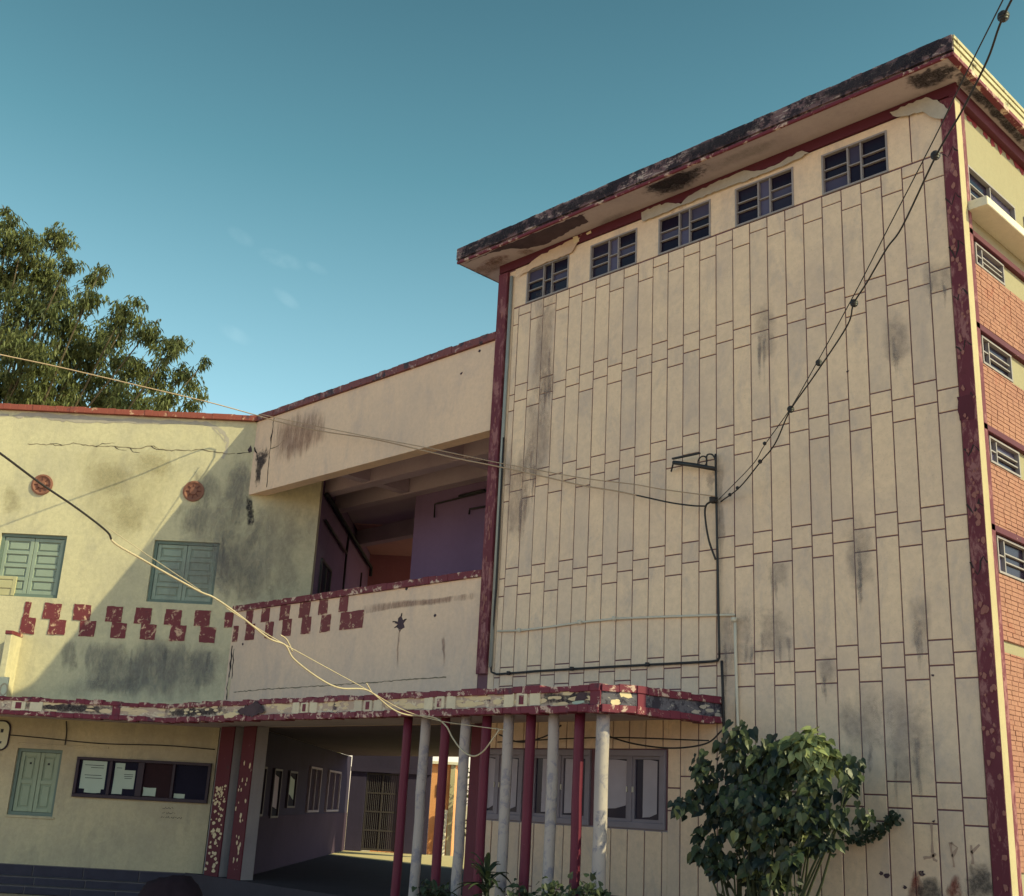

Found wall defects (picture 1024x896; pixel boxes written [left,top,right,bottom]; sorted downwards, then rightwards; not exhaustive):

leakage [807,46,1024,141]
peeling [890,97,948,119]
leakage [680,120,770,158]
peeling [641,151,808,221]
peeling [957,385,975,426]
crack [29,421,284,487]
leakage [256,451,268,481]
spalling [85,701,292,718]
peeling [540,692,590,706]
peeling [611,692,632,705]
peeling [692,704,722,717]
peeling [204,761,251,873]